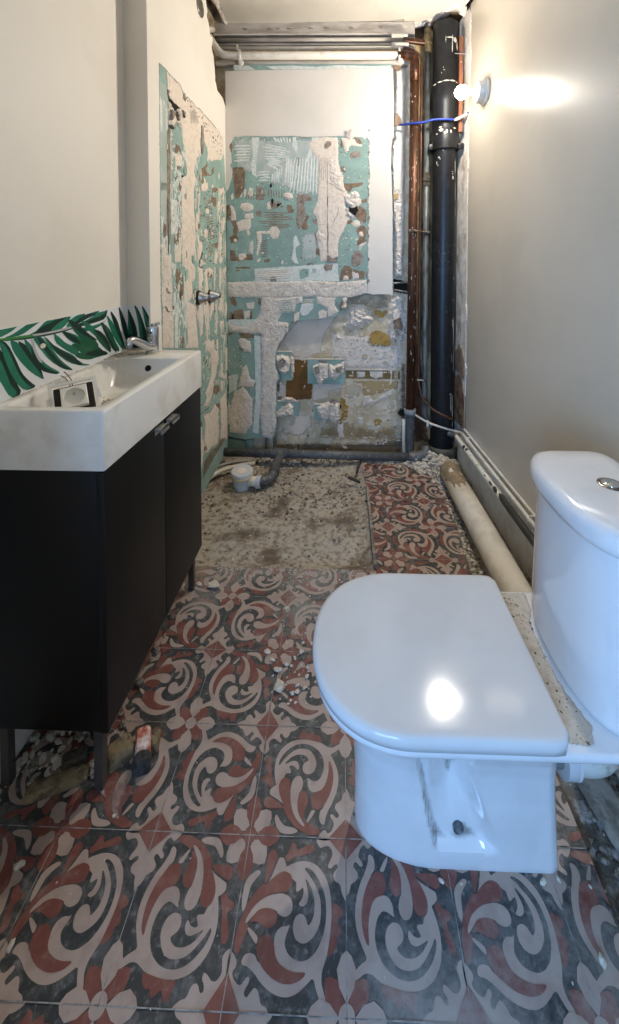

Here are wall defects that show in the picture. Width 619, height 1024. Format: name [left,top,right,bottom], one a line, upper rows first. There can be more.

peeling [163,102,280,349]
peeling [228,302,261,434]
flaking render [312,384,343,401]
spalling [348,460,377,568]